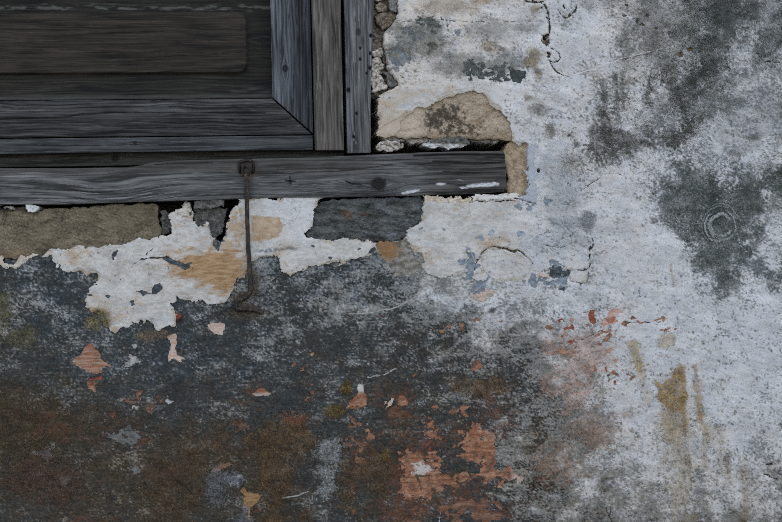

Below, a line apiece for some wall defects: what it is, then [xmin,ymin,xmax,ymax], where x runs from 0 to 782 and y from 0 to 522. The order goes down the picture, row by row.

crack [507,0,577,77]
flaking render [0,15,589,362]
water stain [568,0,782,303]
peeling [72,343,111,392]
peeling [125,344,141,367]
corrosion [655,364,704,434]